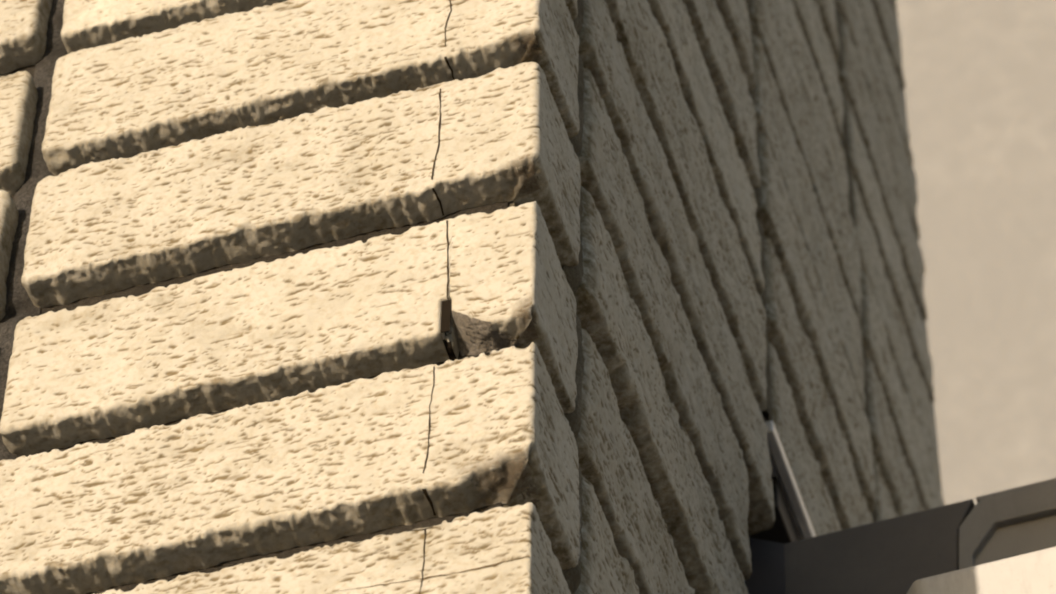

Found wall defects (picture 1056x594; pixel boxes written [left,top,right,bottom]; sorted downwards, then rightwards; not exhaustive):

crack [431,0,455,300]
spalling [441,299,520,361]
crack [327,366,546,594]